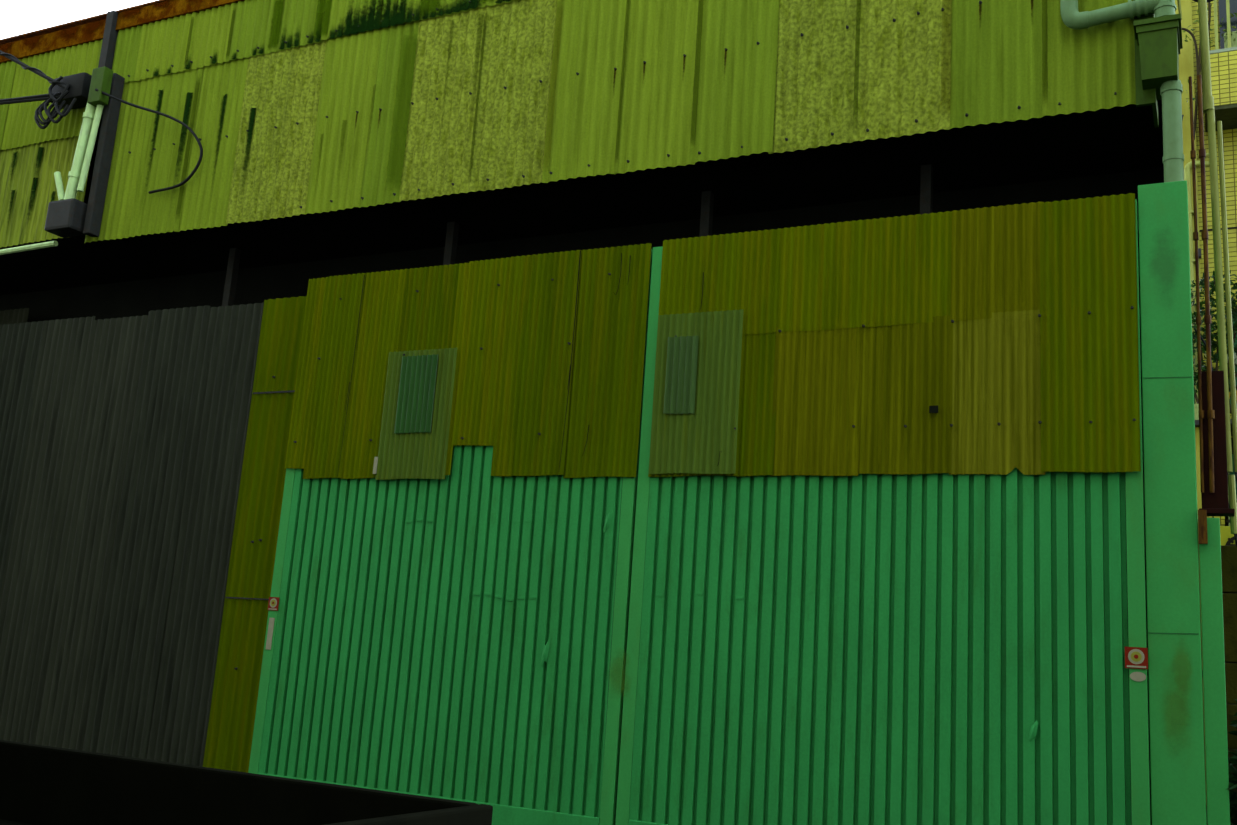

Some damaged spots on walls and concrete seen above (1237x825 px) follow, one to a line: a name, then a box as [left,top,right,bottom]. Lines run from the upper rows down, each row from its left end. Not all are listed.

rust [121,0,170,19]
leakage [211,10,236,64]
leakage [252,0,510,55]
leakage [149,19,194,170]
leakage [176,82,200,214]
leakage [214,94,227,173]
leakage [243,107,256,170]
leakage [469,23,486,171]
leakage [615,0,629,157]